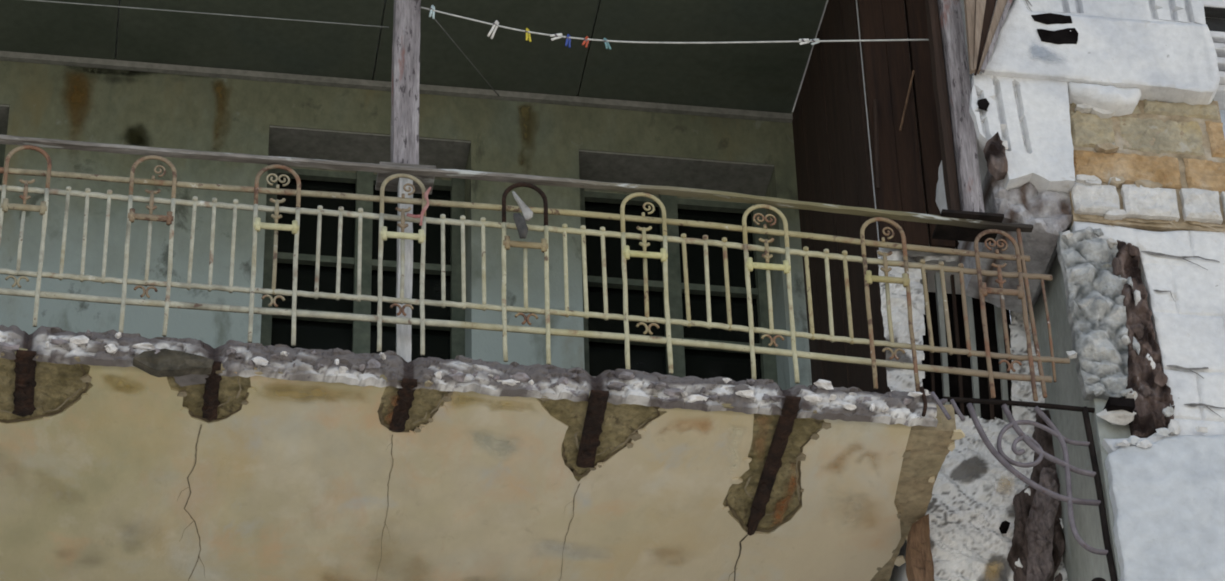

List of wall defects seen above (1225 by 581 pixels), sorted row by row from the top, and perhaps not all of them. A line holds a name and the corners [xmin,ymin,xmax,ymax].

flaking render [958,98,1225,438]
crack [177,424,205,581]
crack [376,435,393,579]
spalling [0,325,965,581]
crack [559,484,580,581]
crack [728,535,748,581]
spalling [999,410,1066,581]